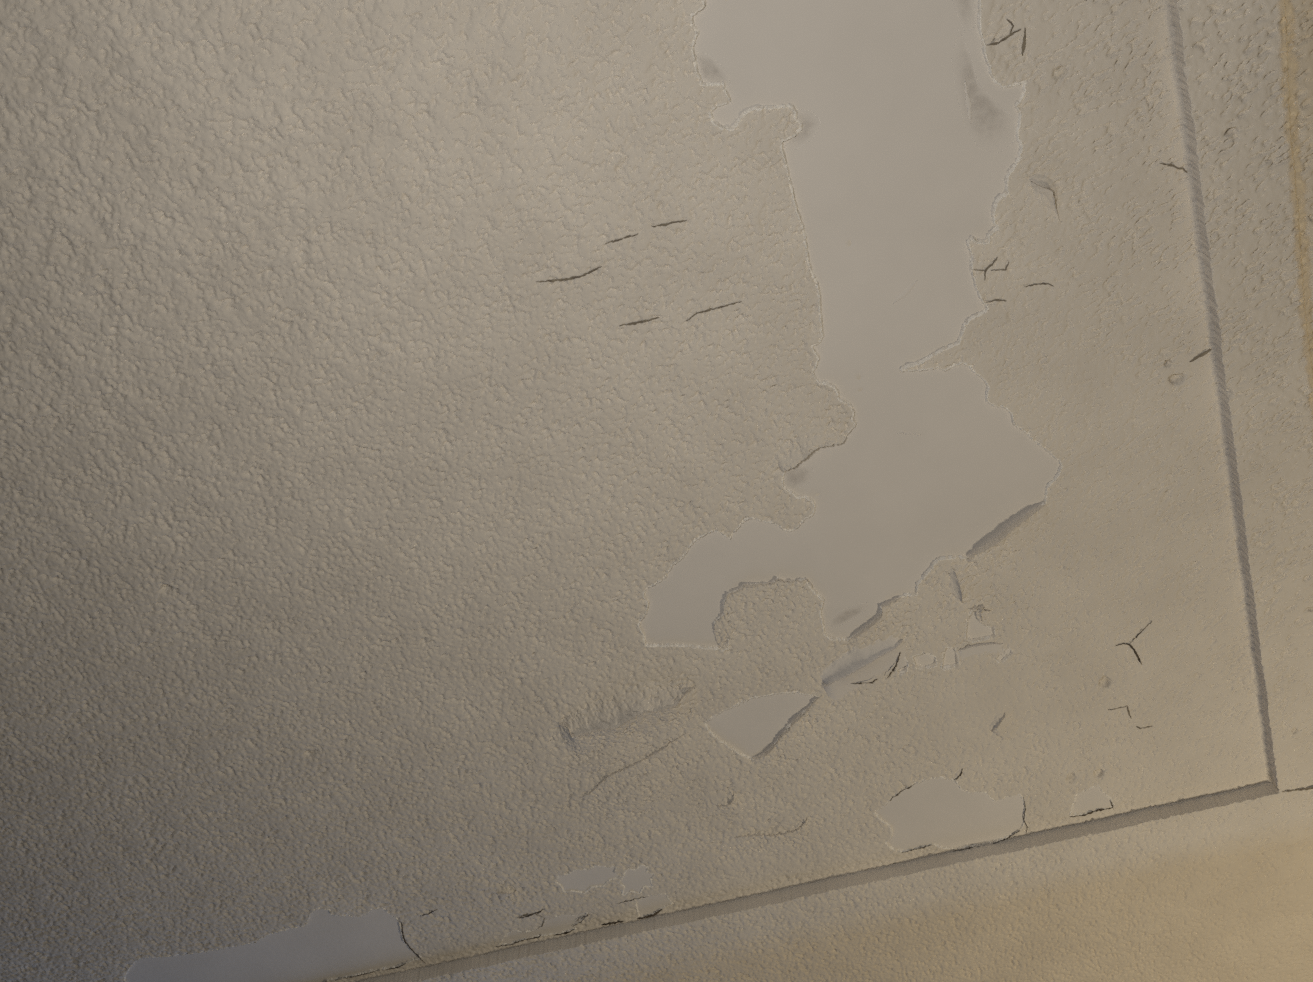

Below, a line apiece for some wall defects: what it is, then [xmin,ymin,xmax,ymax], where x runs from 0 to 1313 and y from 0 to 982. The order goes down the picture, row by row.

peeling [704,690,836,770]
peeling [873,776,1026,853]
peeling [123,907,422,982]